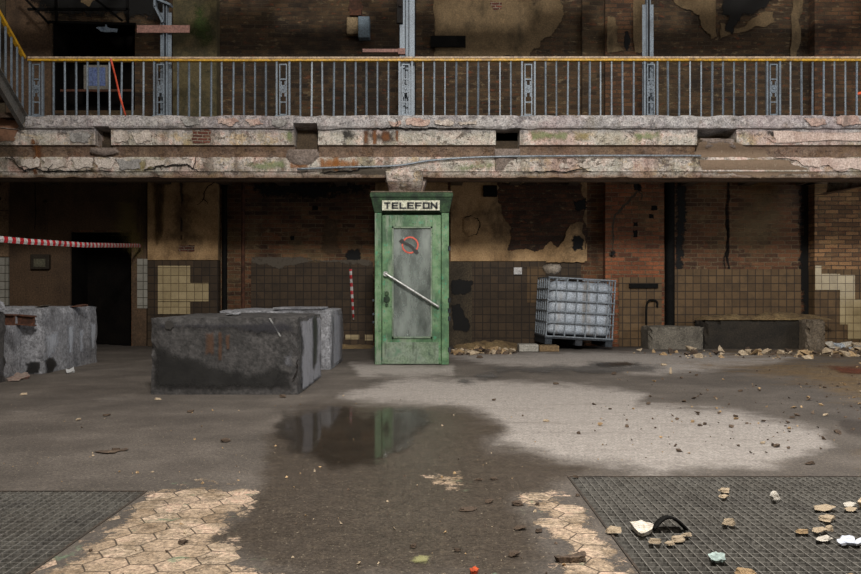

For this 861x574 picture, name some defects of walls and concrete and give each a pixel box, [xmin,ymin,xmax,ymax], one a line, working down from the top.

peeling [20,157,192,170]
spalling [694,115,861,178]
flaking render [497,182,588,252]
crack [722,182,730,269]